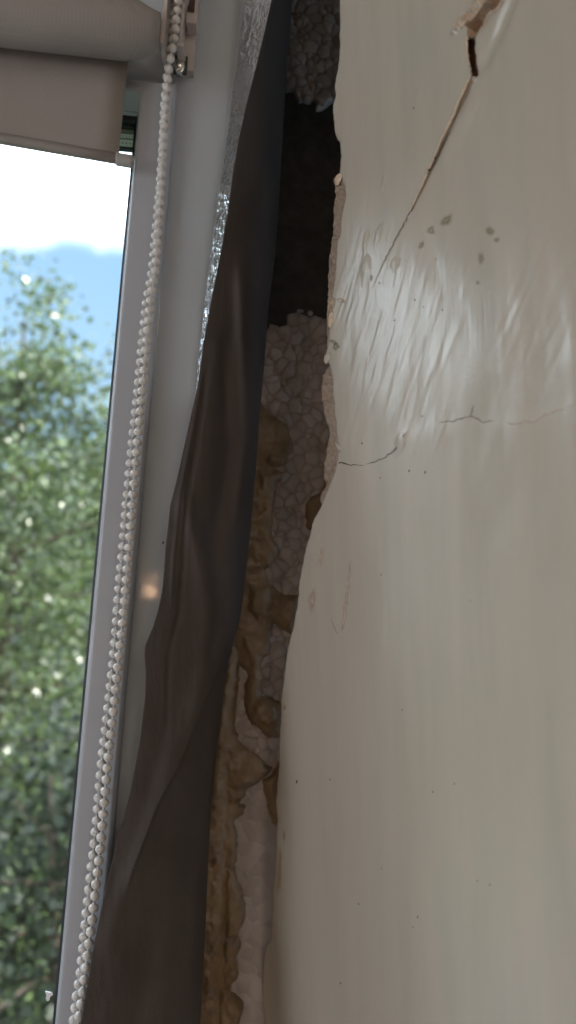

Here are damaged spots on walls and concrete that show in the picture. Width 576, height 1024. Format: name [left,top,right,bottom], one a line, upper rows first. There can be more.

flaking render [453,0,504,40]
crack [381,36,479,268]
flaking render [320,173,346,504]
crack [339,434,405,466]